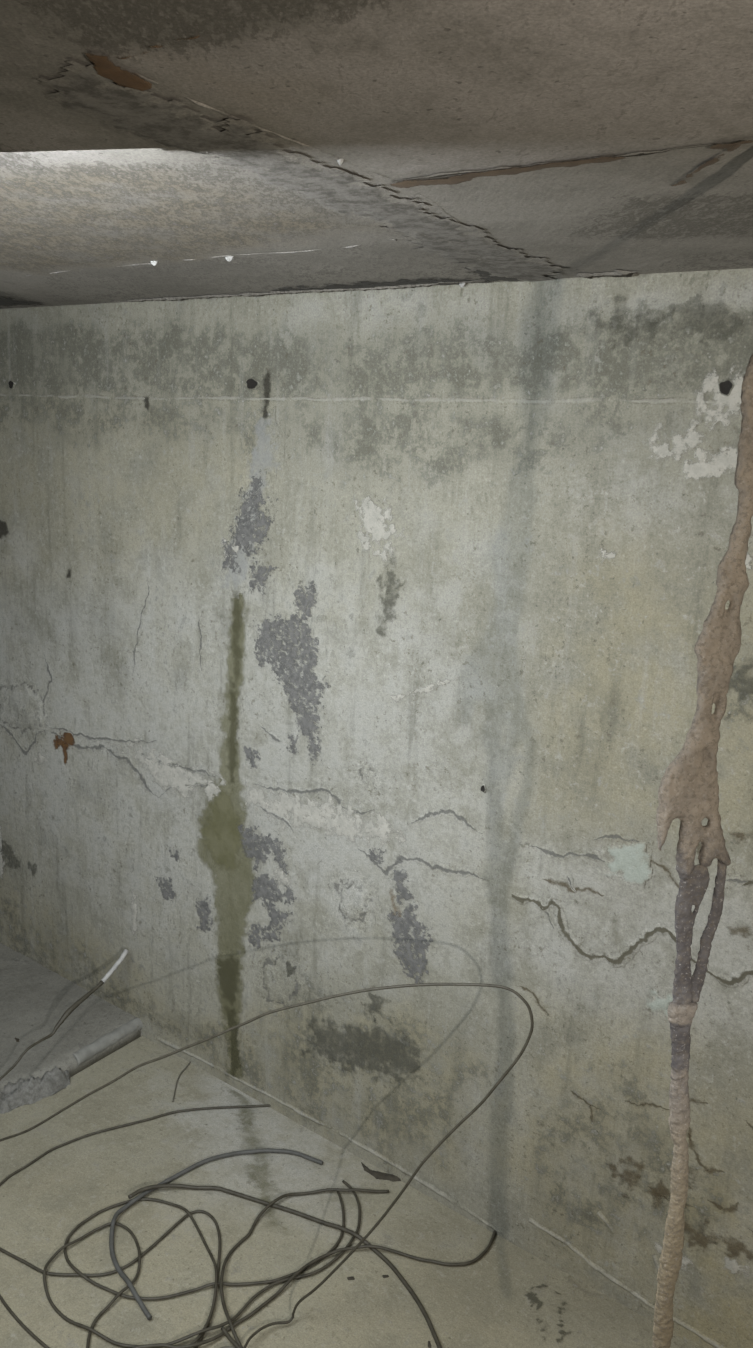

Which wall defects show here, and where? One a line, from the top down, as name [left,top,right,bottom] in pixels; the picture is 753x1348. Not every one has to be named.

corrosion [85,45,163,91]
corrosion [390,157,625,188]
peeling [648,419,738,480]
peeling [221,469,278,596]
peeling [254,581,331,765]
corrosion [53,732,75,764]
water stain [95,406,406,1077]
crack [0,653,753,988]
peeling [368,849,433,984]
water stain [302,993,419,1081]